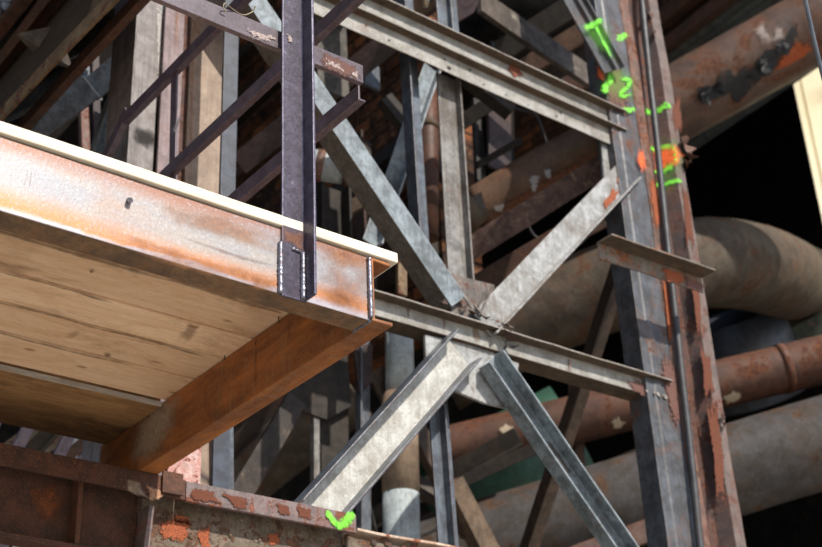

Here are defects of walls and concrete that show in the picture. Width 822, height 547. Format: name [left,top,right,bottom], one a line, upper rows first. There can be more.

rust [775,42,819,71]
rust [672,95,699,169]
rust [603,179,619,210]
rust [648,179,661,230]
rust [682,188,695,250]
rust [623,349,682,428]
rust [660,268,726,501]
peeling [128,481,163,501]
peeling [189,488,251,513]
peeling [276,503,312,519]
peeling [160,515,211,547]